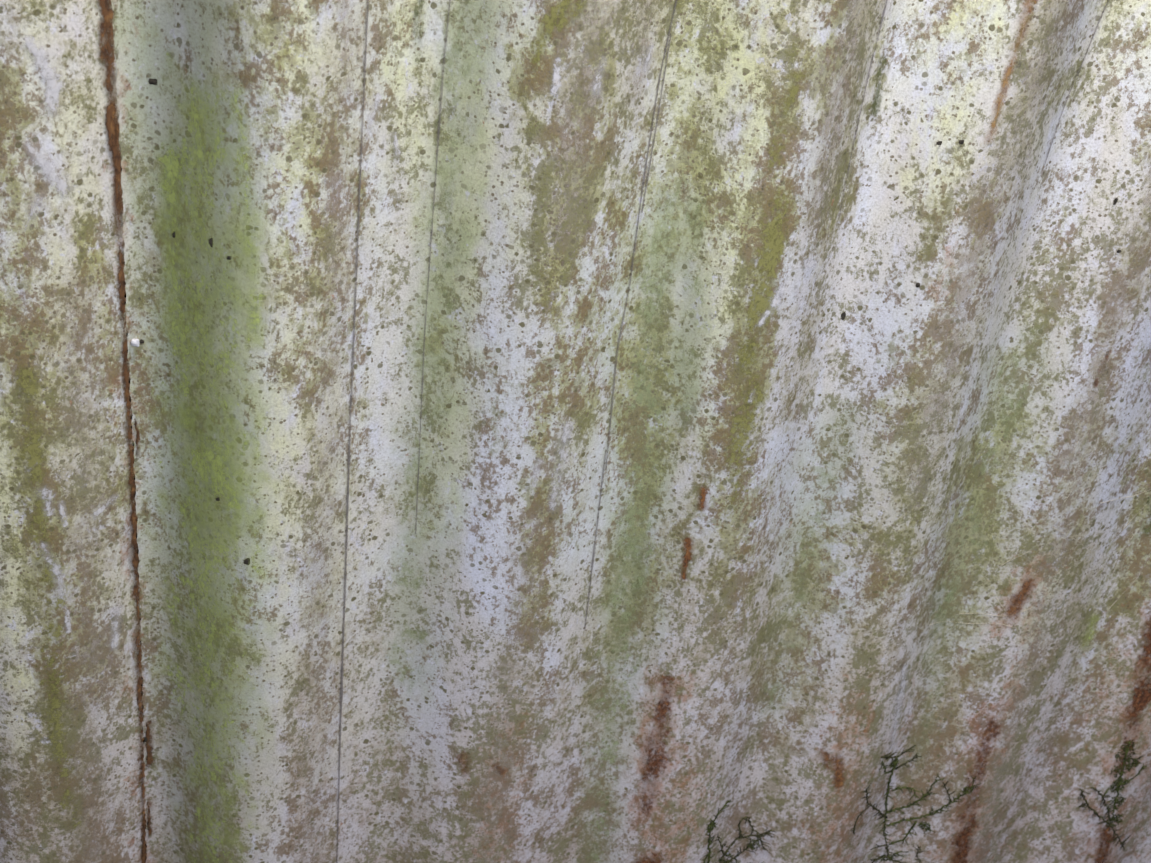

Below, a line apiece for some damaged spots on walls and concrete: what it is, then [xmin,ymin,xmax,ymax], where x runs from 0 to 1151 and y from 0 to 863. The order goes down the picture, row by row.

rust [991,33,1022,133]
rust [98,0,153,863]
leakage [159,83,261,863]
rust [642,675,675,814]
rust [1116,621,1151,773]